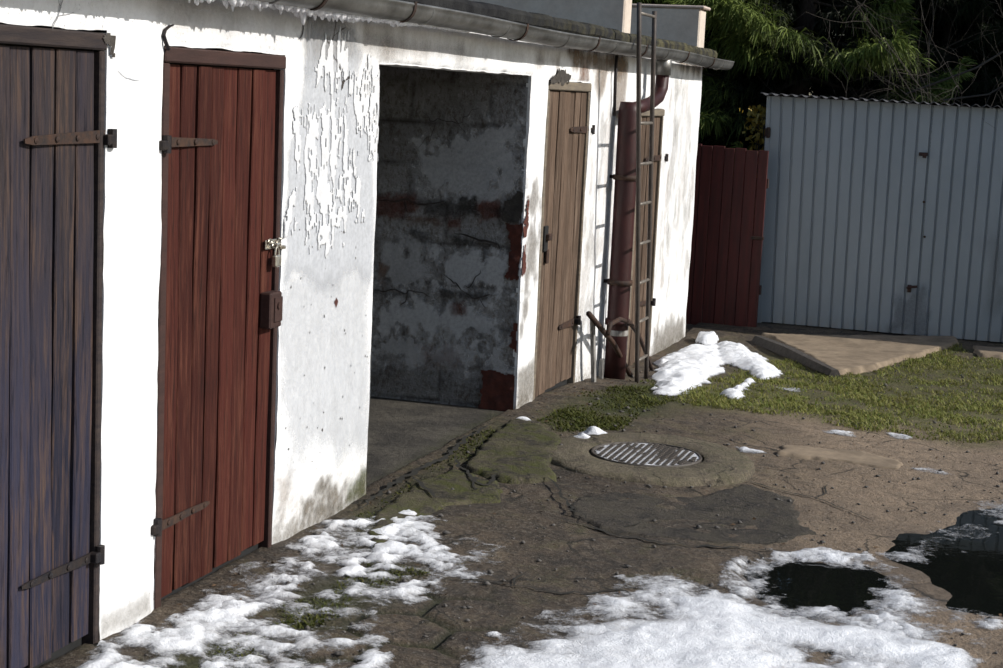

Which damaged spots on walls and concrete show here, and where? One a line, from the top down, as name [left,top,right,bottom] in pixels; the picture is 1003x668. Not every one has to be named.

peeling [282,17,538,447]
water stain [304,478,342,519]